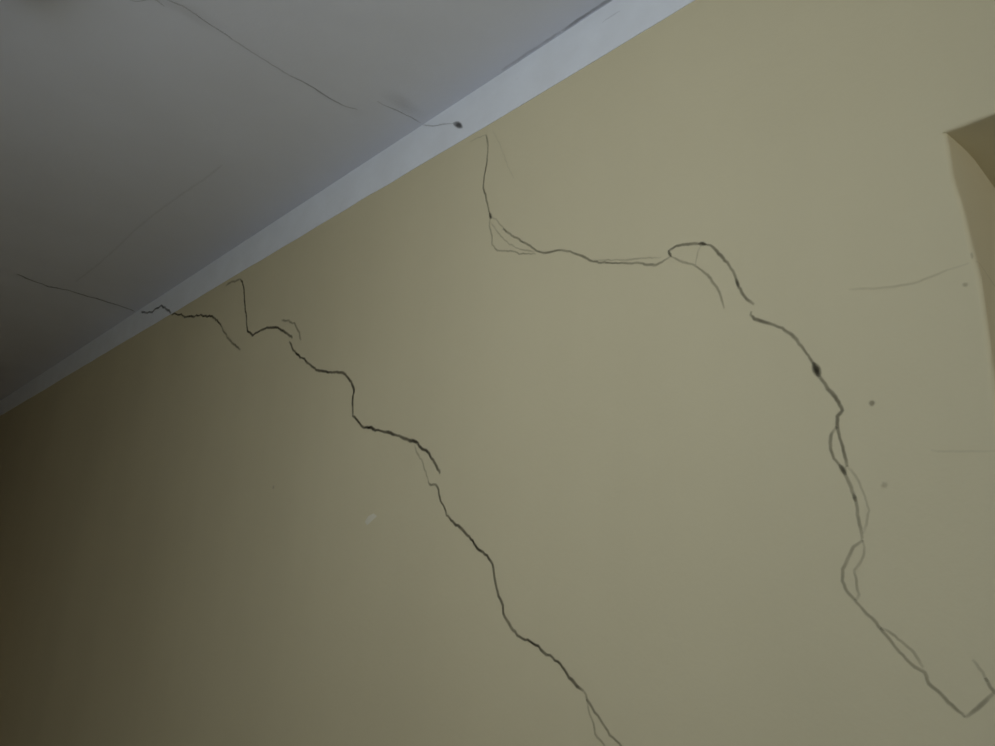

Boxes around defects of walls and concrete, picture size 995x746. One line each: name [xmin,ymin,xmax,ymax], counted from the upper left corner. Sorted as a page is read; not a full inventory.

crack [142,305,221,325]
crack [241,281,437,468]
crack [439,496,493,566]
crack [520,637,579,688]